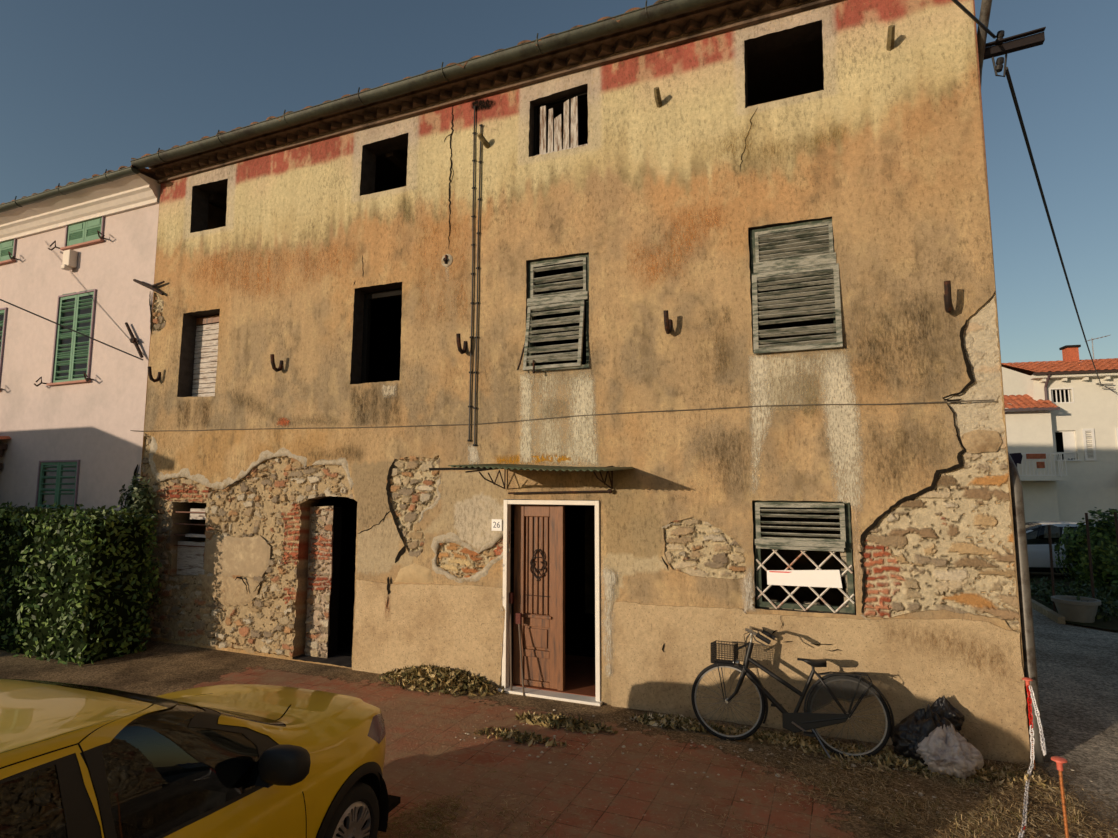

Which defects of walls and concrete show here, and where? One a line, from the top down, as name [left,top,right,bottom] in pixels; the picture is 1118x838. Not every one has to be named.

crack [740,109,757,170]
peeling [140,433,354,657]
peeling [386,454,510,583]
damp [520,372,597,466]
peeling [661,517,747,579]
damp [712,351,863,594]
peeling [840,292,1020,632]